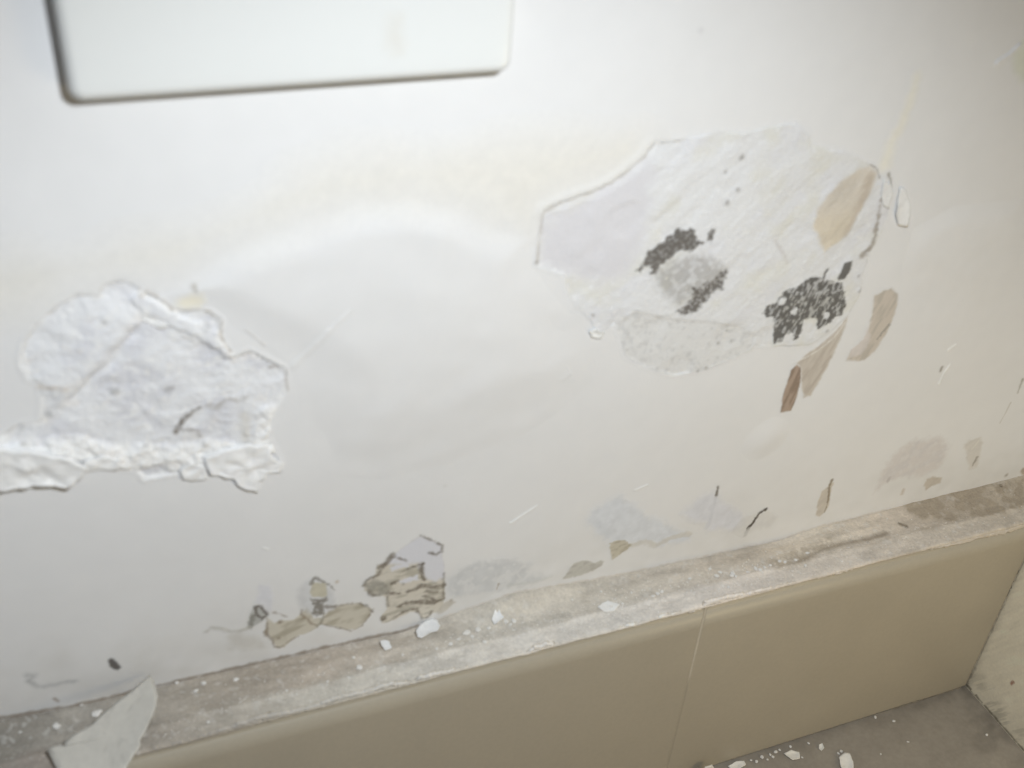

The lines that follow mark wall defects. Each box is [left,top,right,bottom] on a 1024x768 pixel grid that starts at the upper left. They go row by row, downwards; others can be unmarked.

spalling [531,119,911,414]
spalling [0,277,293,493]
peeling [261,601,375,650]
peeling [416,618,440,638]